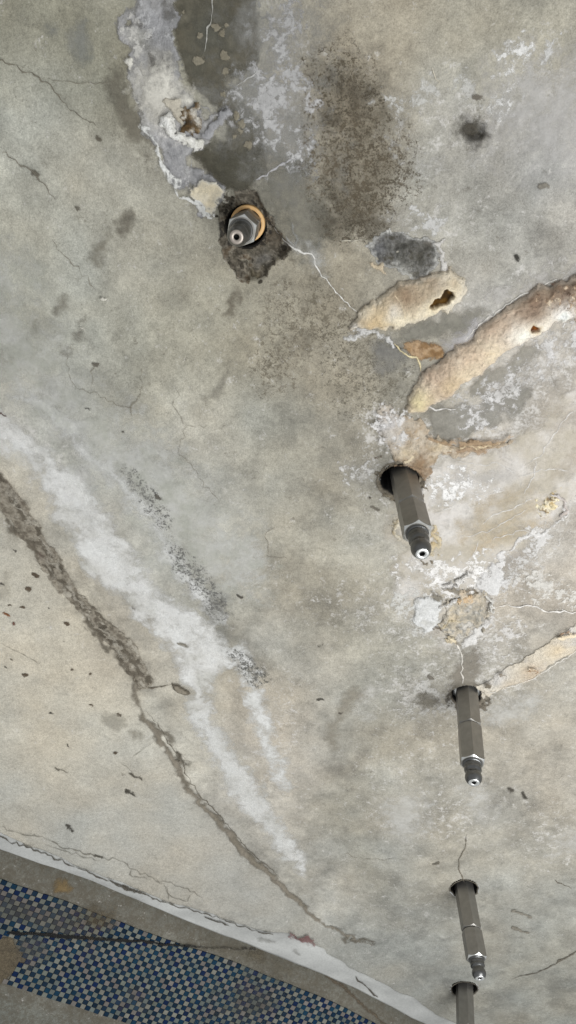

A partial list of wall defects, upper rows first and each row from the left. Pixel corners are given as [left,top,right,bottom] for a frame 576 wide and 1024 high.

crack [0,59,114,127]
damp [109,0,449,250]
crack [274,228,357,312]
damp [344,249,576,375]
damp [0,264,307,875]
crack [0,474,373,950]